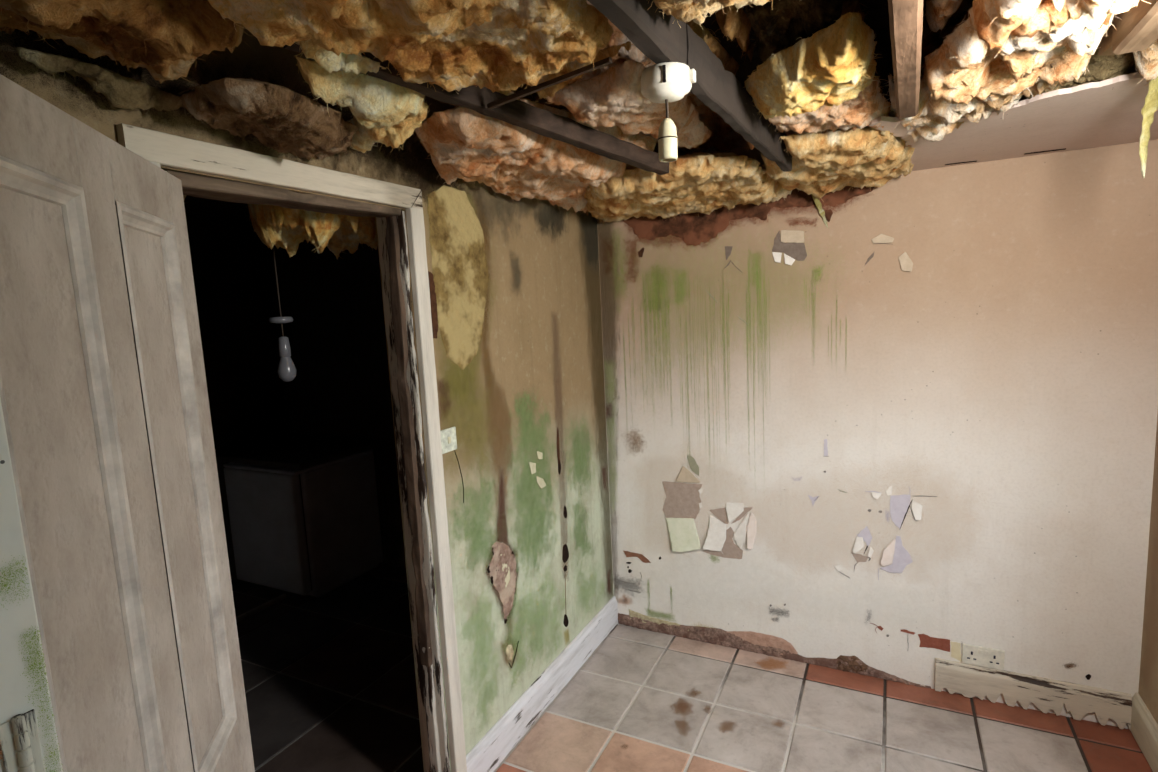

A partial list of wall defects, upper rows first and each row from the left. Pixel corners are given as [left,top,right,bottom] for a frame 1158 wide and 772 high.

flaking render [620,186,874,265]
peeling [865,234,913,272]
flaking render [422,182,499,423]
water stain [438,182,997,745]
peeling [624,466,756,573]
peeling [853,537,896,567]
peeling [911,501,923,520]
flaking render [483,537,519,670]
flaking render [618,609,931,688]
flaking render [918,634,961,662]